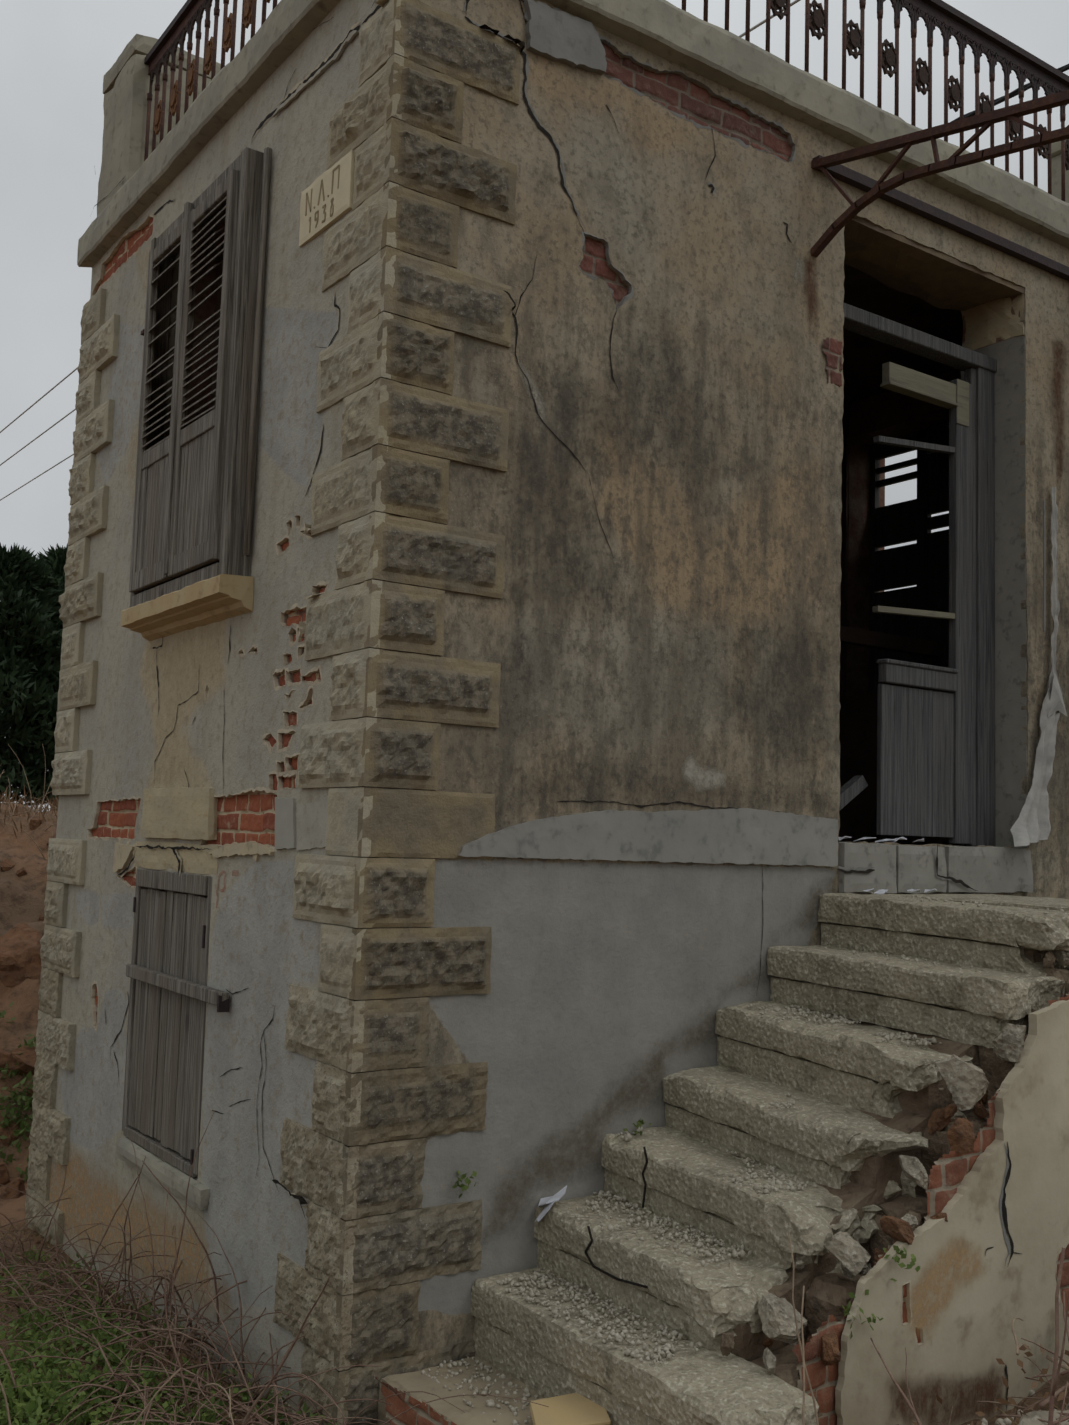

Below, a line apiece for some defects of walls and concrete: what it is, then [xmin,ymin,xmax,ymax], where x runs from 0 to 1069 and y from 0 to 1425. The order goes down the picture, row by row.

crack [252,0,389,139]
crack [463,0,586,231]
spalling [523,0,796,162]
spalling [579,231,634,312]
spalling [276,515,313,556]
spalling [199,581,329,861]
water stain [685,759,724,788]
spalling [87,796,141,889]
crack [212,988,308,1217]
crack [641,1147,649,1208]
crack [584,1226,648,1288]
spalling [900,1280,924,1348]